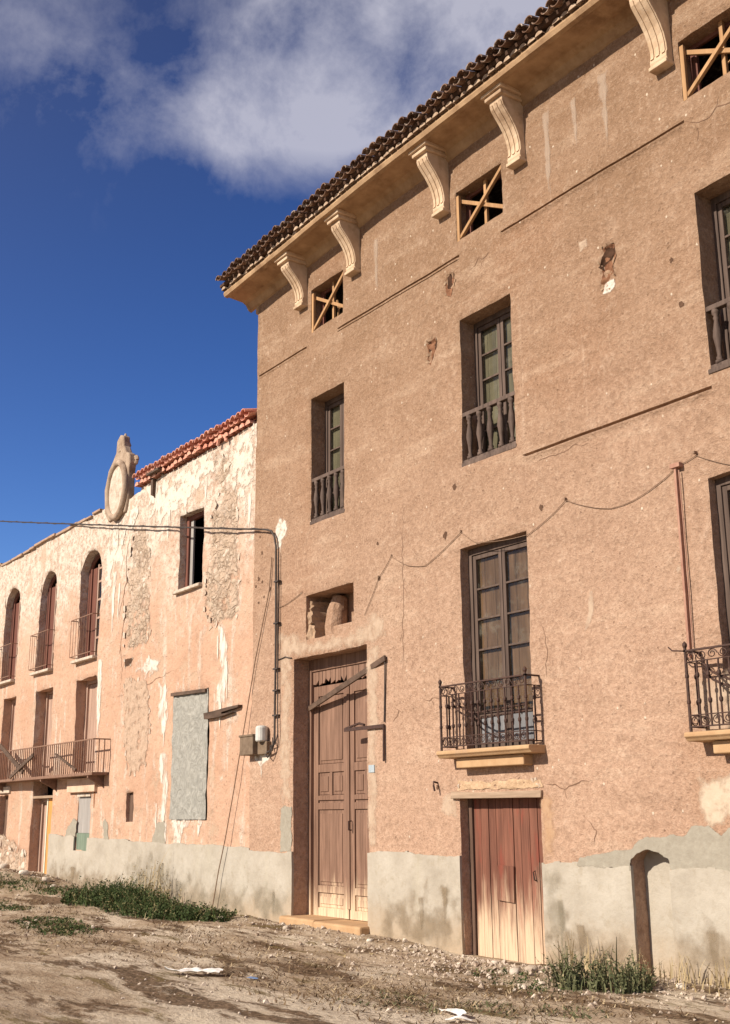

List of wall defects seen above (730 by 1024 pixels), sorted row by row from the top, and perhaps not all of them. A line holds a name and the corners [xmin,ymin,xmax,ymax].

spalling [444,272,456,297]
spalling [597,243,616,291]
spalling [426,338,437,365]
spalling [104,423,255,777]
damp [216,626,228,728]
damp [155,683,202,843]